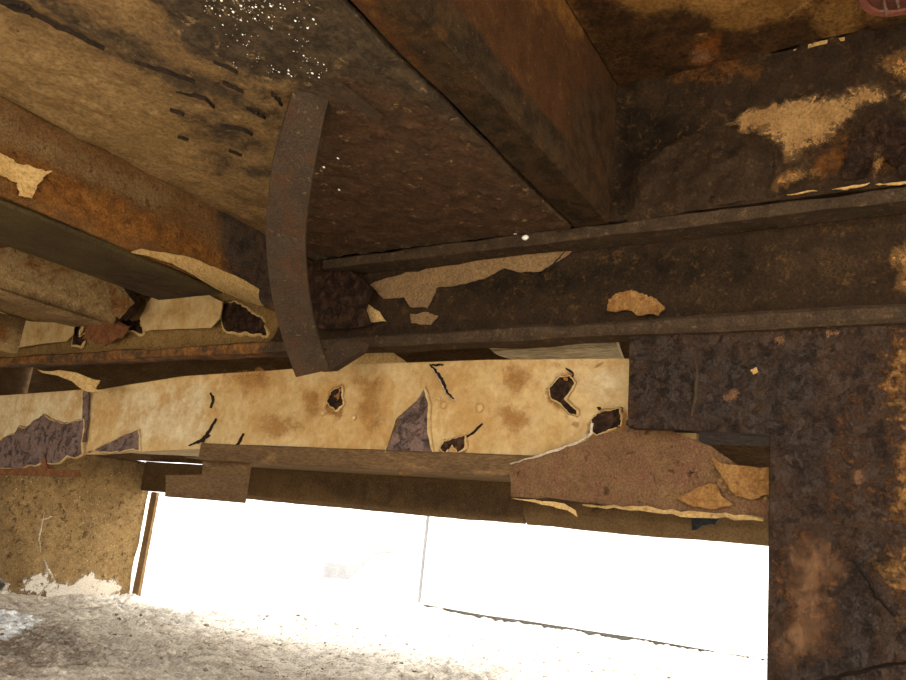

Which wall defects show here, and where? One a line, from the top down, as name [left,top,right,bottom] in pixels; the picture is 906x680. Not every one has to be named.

peeling [0,153,52,199]
peeling [0,247,135,319]
peeling [131,249,263,332]
peeling [367,251,572,325]
peeling [19,321,75,348]
peeling [39,370,110,393]
peeling [348,353,407,365]
peeling [385,387,435,452]
peeling [510,406,628,464]
peeling [512,483,763,521]
corrosion [784,542,847,659]
crack [818,662,906,680]